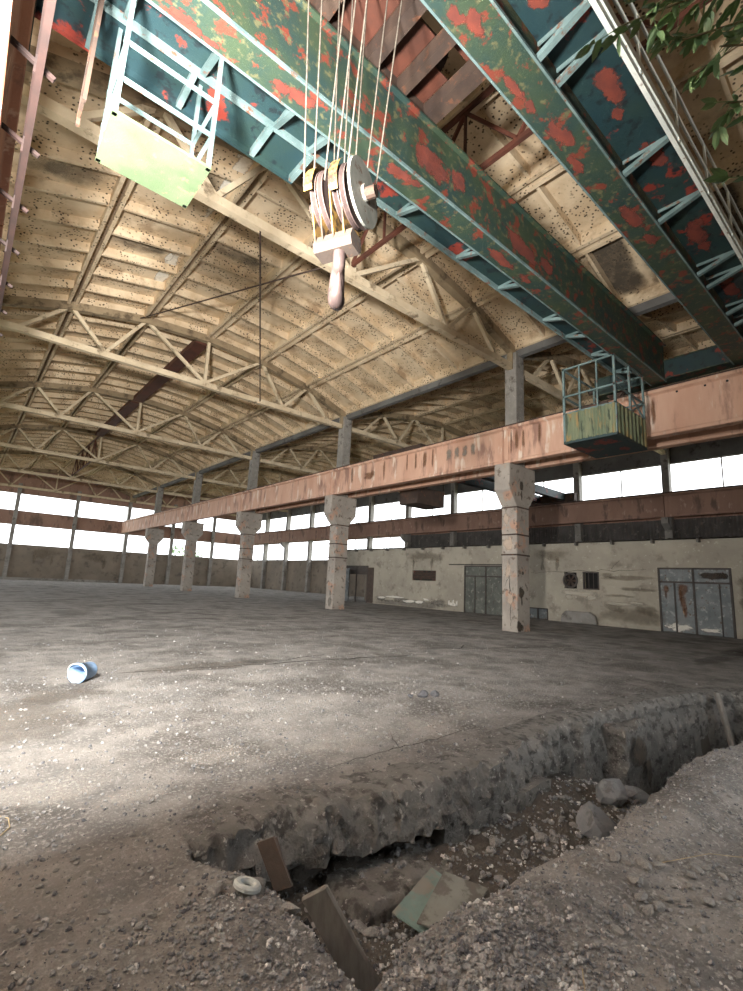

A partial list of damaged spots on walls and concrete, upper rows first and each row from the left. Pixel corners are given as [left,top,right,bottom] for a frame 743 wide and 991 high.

spalling [3,0,12,49]
rust [166,0,219,50]
rust [446,4,484,37]
rust [528,0,549,9]
rust [269,78,315,109]
rust [502,71,536,114]
rust [592,67,626,120]
rust [386,162,420,188]
rust [416,143,465,192]
rust [545,118,584,174]
rust [639,141,669,167]
rust [487,248,531,283]